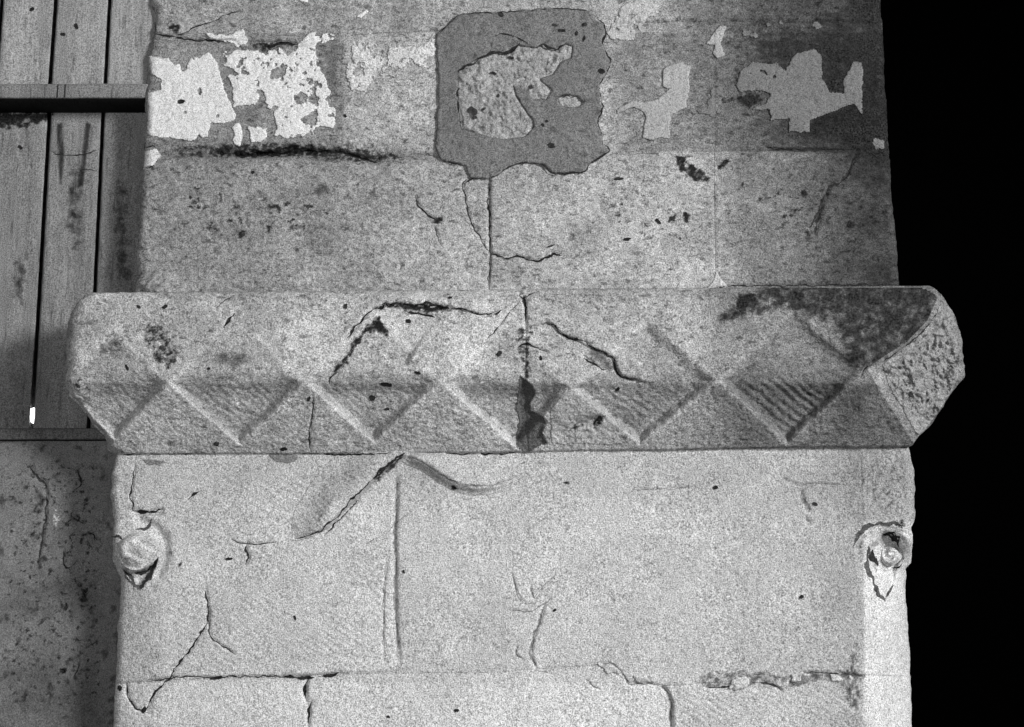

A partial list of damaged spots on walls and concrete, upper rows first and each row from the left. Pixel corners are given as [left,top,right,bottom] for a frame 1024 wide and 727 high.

peeling [144,29,335,167]
crack [441,8,612,284]
peeling [617,62,691,140]
peeling [736,49,863,133]
crack [347,288,634,380]
crack [703,281,895,289]
crack [233,373,515,647]
crack [126,591,339,722]